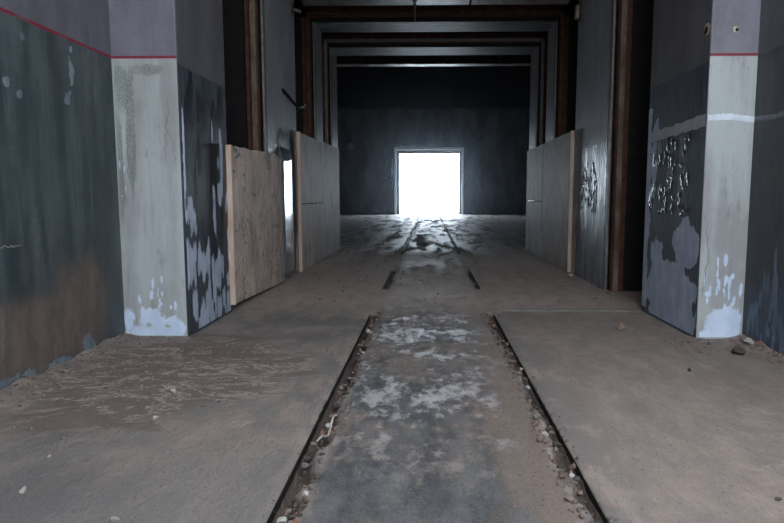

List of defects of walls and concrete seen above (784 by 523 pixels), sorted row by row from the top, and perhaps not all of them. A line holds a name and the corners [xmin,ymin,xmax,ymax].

peeling [124,276,187,336]
leakage [181,71,228,242]
peeling [181,109,231,328]
peeling [642,108,784,354]